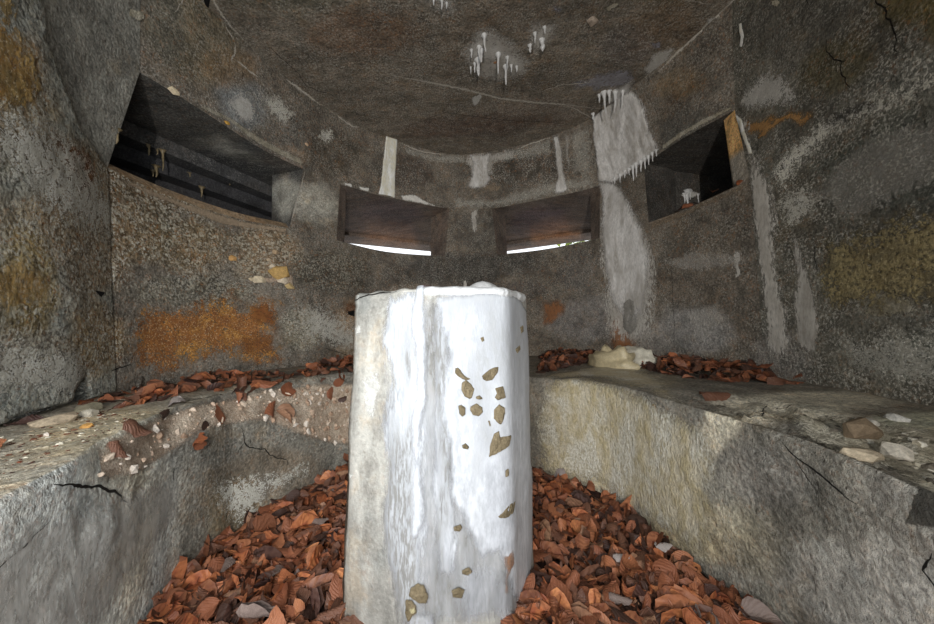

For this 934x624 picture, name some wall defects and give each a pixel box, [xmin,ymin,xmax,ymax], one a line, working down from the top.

corrosion [0,0,43,107]
crack [826,39,850,95]
crack [875,0,897,60]
water stain [768,70,934,229]
corrosion [128,288,284,377]
water stain [600,182,656,344]
water stain [794,239,819,351]
water stain [362,281,533,624]